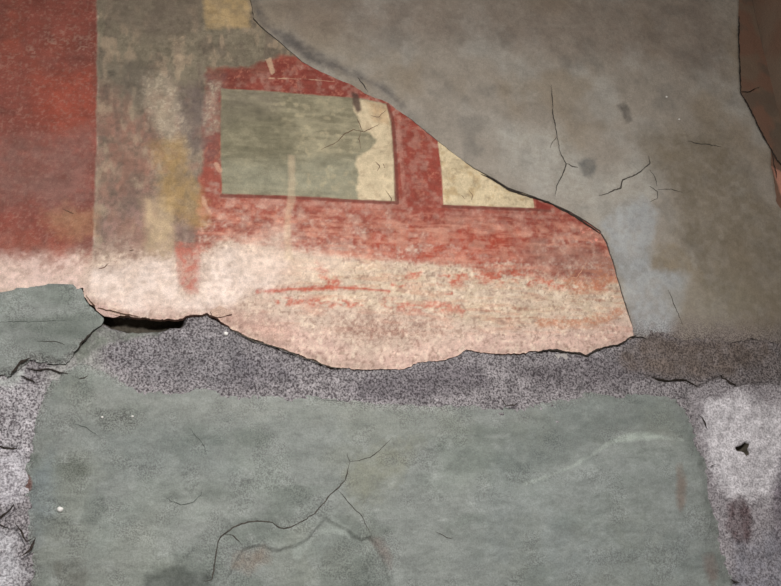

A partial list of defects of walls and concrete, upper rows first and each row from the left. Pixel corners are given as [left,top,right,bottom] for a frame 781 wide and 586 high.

peeling [265,57,335,82]
crack [321,110,386,150]
crack [599,159,683,201]
crack [0,358,87,384]
spalling [0,305,781,586]
crack [0,504,36,556]
crack [207,438,392,581]